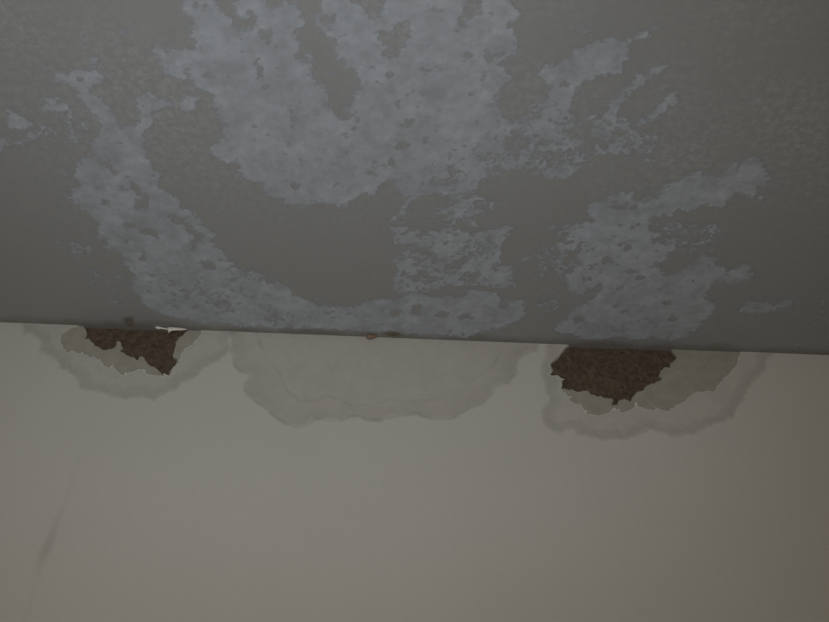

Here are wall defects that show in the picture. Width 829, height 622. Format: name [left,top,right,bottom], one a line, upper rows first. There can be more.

water stain [0,0,782,341]
peeling [59,325,202,377]
peeling [549,345,741,417]